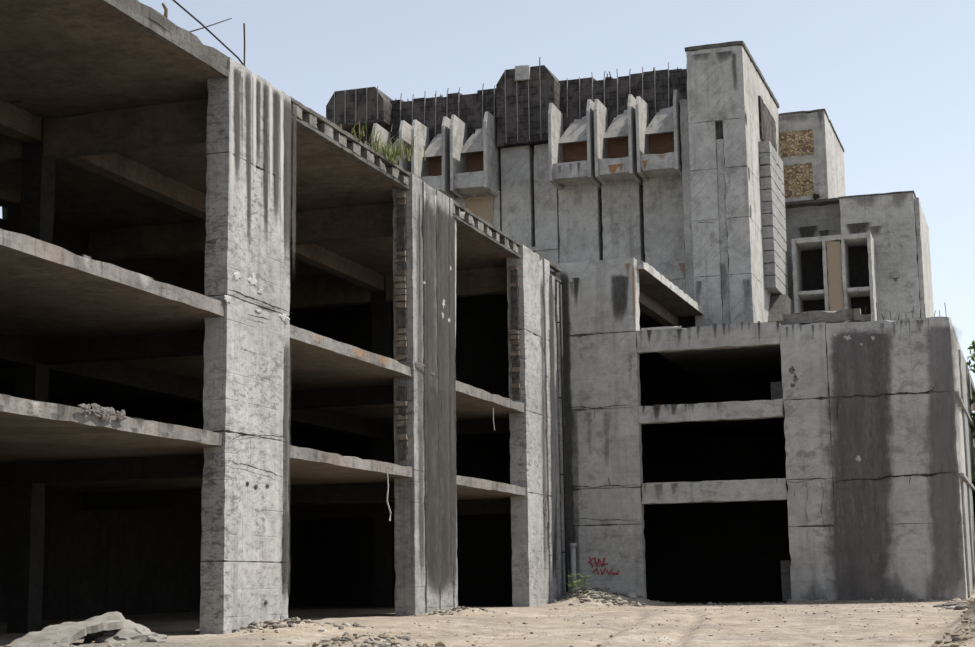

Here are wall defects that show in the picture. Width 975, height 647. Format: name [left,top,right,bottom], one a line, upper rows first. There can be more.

damp [229,70,297,255]
damp [417,191,457,590]
damp [828,332,911,601]
crack [835,385,954,420]